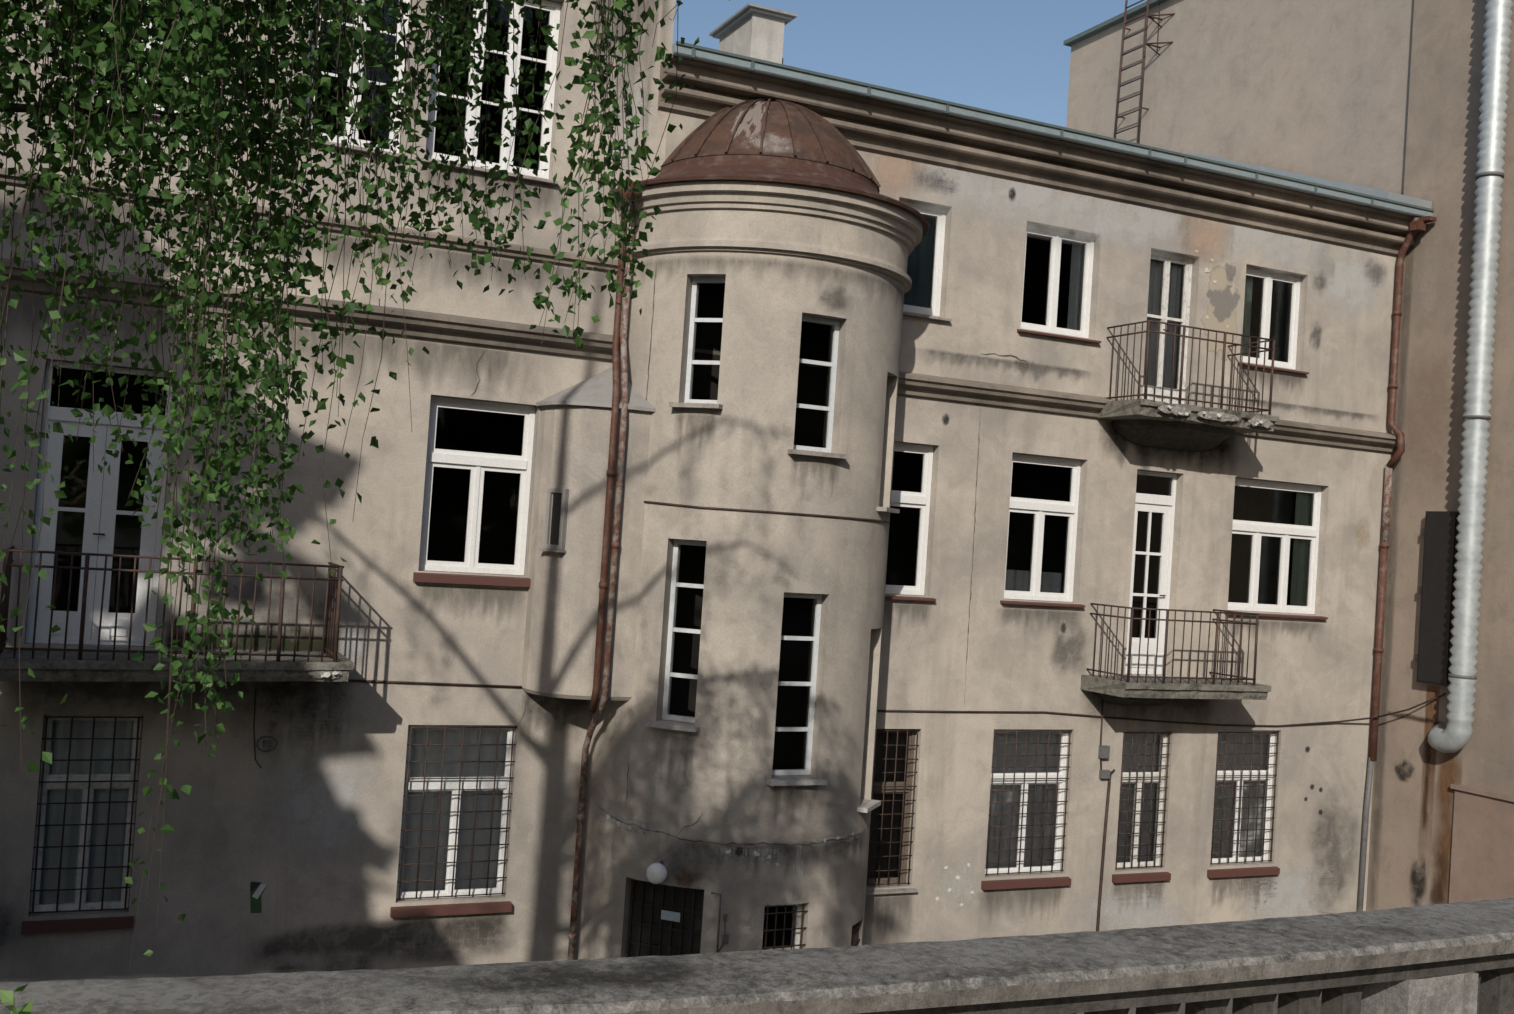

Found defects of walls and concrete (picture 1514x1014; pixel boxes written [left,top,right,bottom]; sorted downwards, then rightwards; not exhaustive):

flaking render [1202,265,1237,359]
spalling [1158,405,1273,428]
rust [1392,688,1457,904]
damp [1263,818,1342,917]